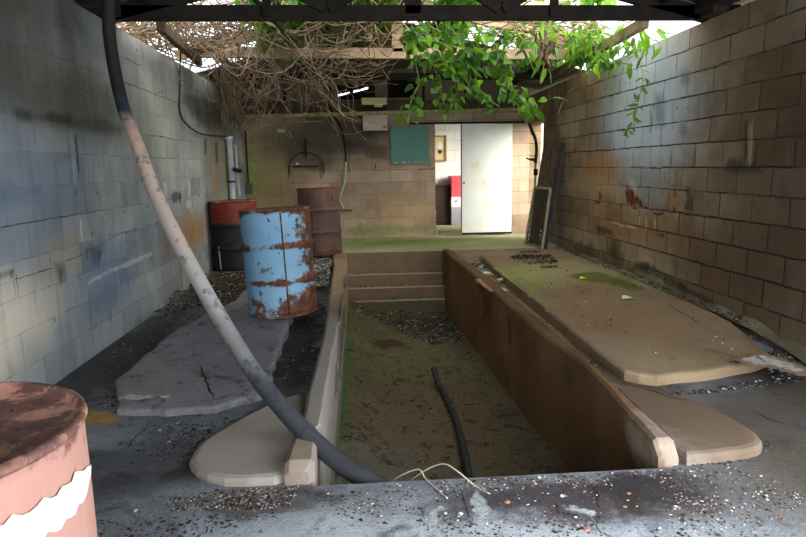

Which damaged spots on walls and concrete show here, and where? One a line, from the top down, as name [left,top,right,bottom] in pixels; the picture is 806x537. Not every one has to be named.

rust [174,212,207,255]
rust [600,184,665,243]
crack [200,367,246,398]
spalling [733,353,806,376]